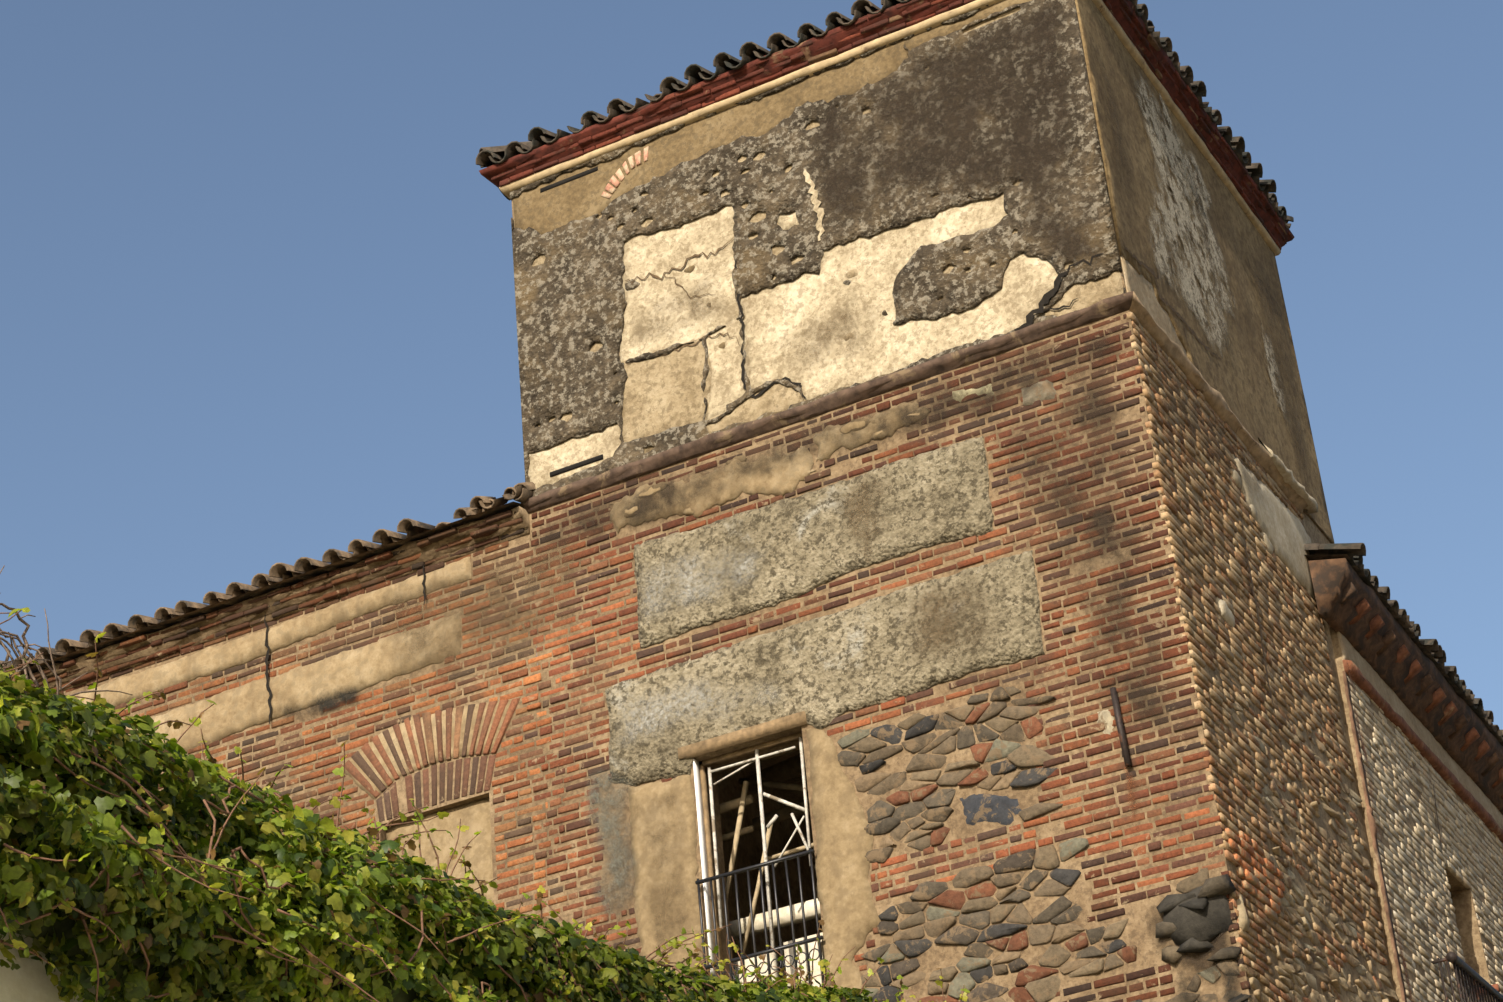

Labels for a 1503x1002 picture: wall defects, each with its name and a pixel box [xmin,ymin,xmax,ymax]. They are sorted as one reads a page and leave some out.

crack [625,238,806,398]
spalling [528,79,1231,492]
crack [264,618,272,724]